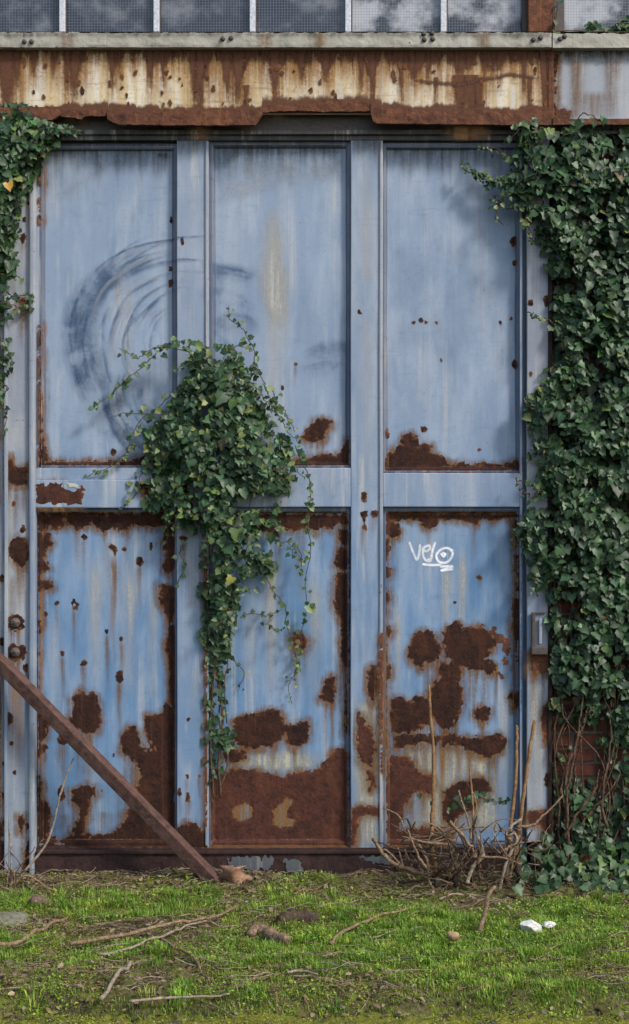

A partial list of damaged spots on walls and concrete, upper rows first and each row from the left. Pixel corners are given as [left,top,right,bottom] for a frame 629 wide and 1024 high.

rust [0,34,581,119]
rust [0,324,548,848]
rust [0,713,169,874]
peeling [227,855,303,875]